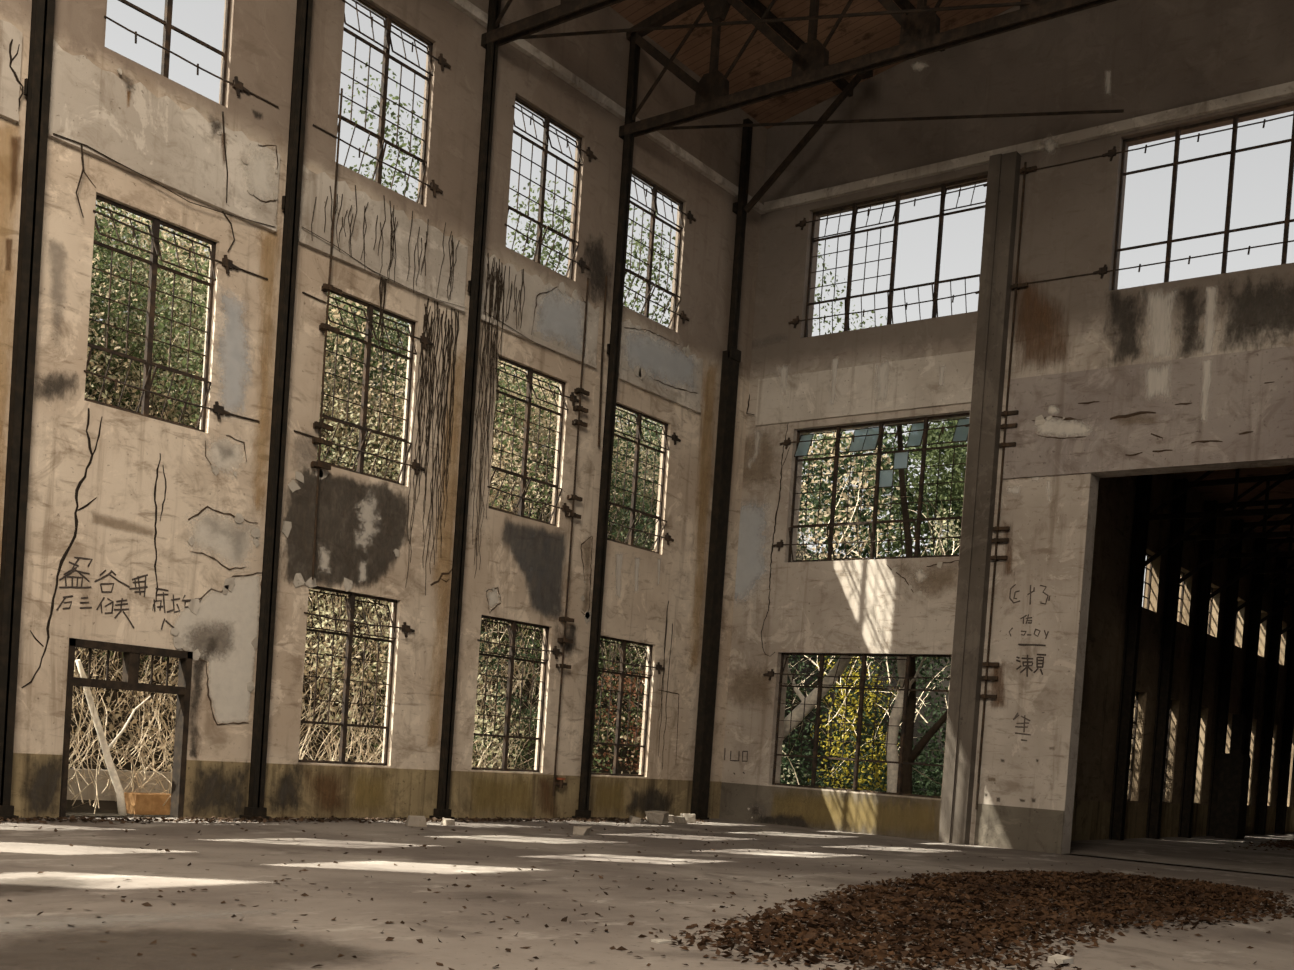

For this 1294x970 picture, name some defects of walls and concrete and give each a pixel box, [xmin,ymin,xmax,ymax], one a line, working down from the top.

water stain [1110,281,1294,420]
crack [21,408,102,688]
crack [153,453,167,607]
water stain [282,468,408,592]
water stain [503,522,564,616]
water stain [26,758,63,816]
water stain [271,766,301,811]